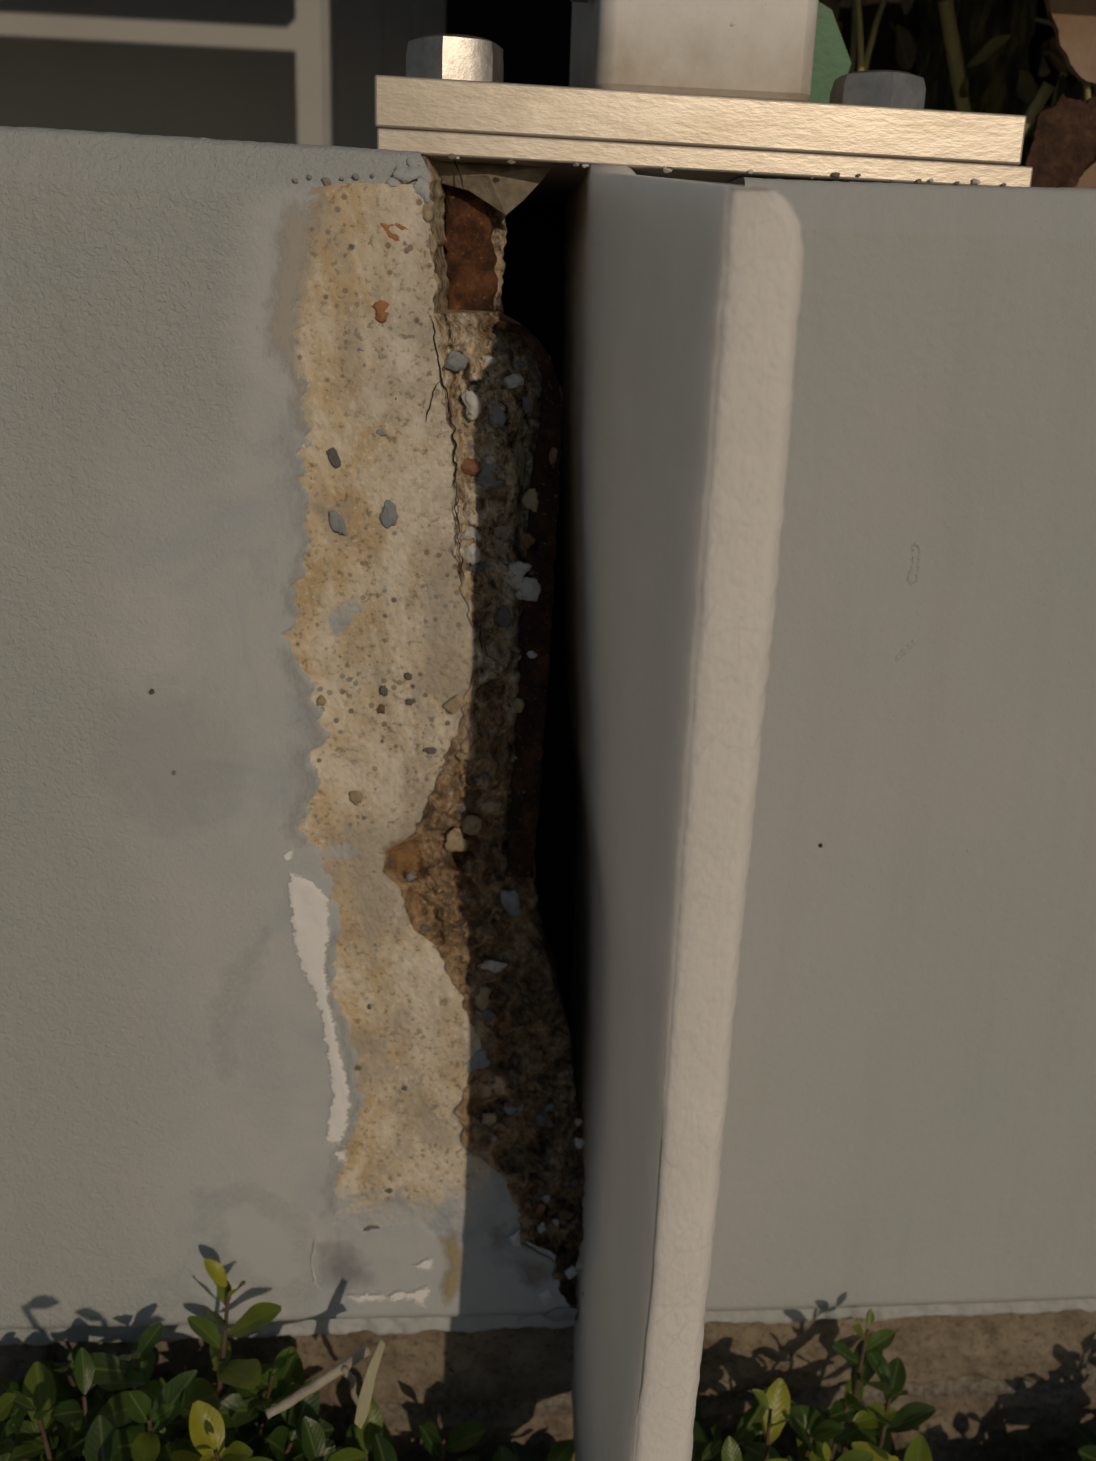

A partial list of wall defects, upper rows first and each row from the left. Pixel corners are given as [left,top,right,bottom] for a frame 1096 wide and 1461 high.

spalling [272,156,585,1322]
rust [444,185,563,878]